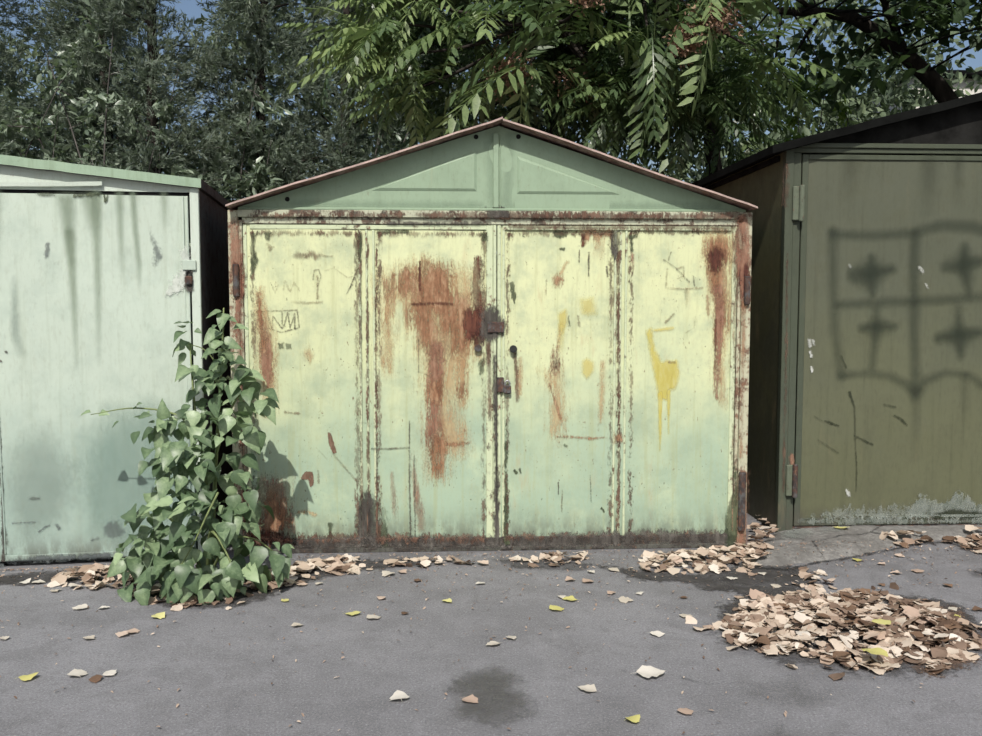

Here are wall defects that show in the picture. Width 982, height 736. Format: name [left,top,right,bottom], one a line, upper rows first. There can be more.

rust [230,206,752,548]
peeling [934,509,982,519]